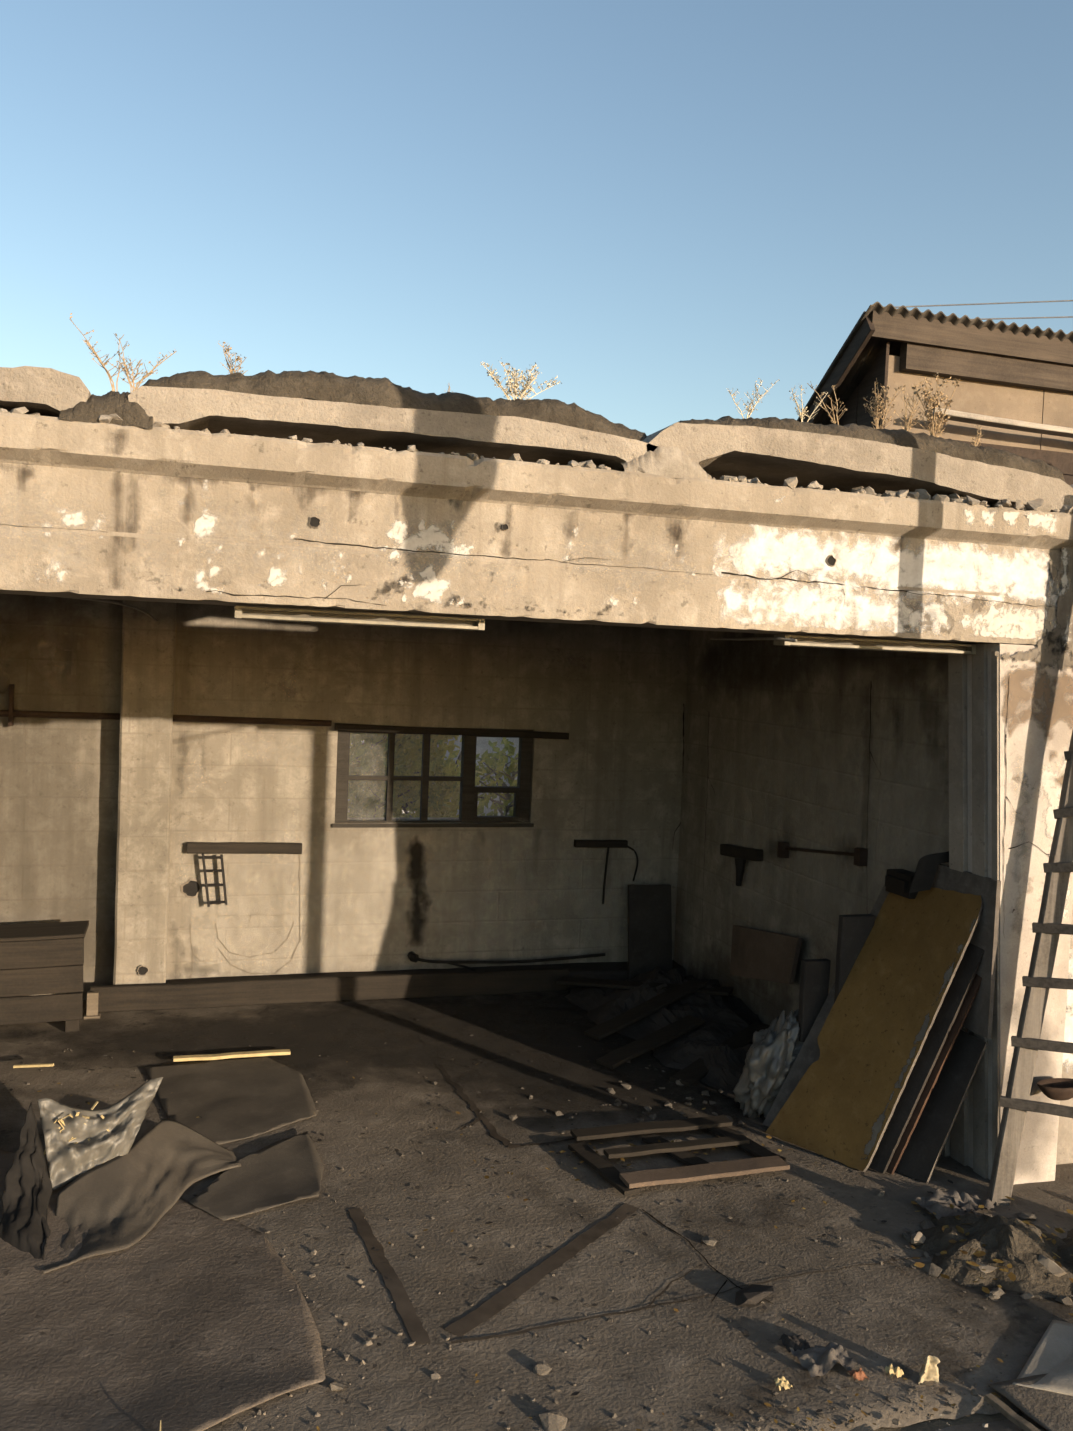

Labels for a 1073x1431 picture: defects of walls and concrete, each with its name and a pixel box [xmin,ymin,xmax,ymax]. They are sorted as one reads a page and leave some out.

peeling [178,509,223,593]
peeling [259,549,301,586]
crack [206,585,387,606]
peeling [382,519,474,605]
crack [293,538,1052,607]
peeling [713,509,1073,839]
damp [409,840,429,945]
peeling [1063,950,1073,1069]
crack [451,1209,923,1344]